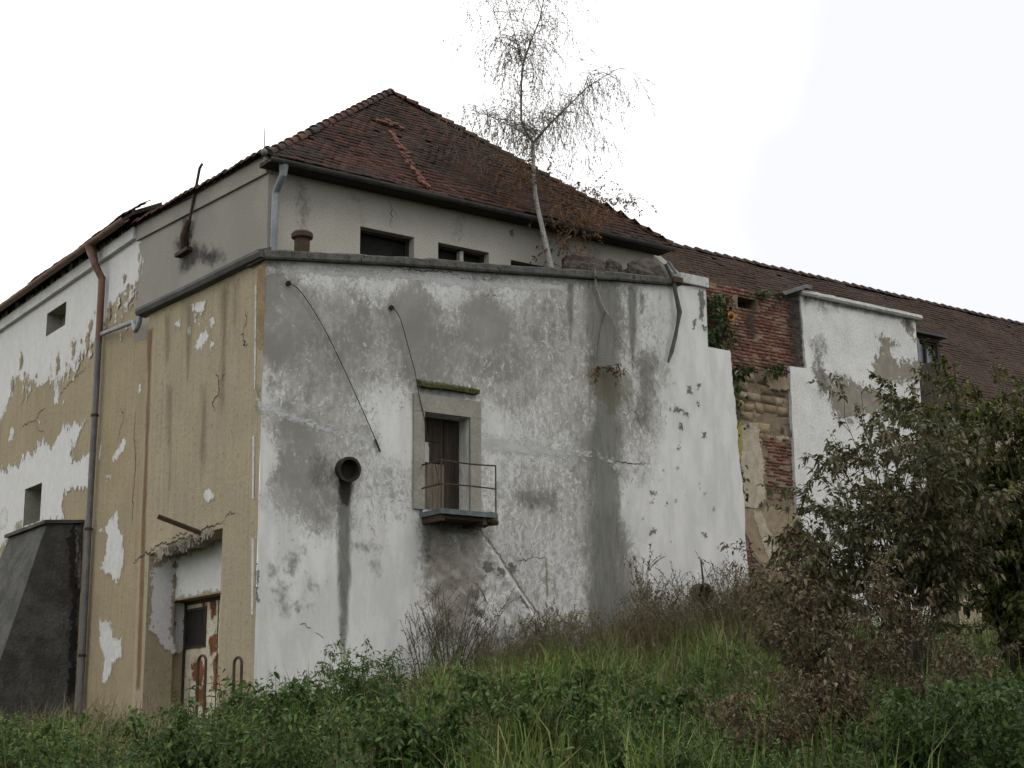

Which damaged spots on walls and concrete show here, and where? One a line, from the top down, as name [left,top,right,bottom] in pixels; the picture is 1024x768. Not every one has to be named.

peeling [0,419,127,550]
peeling [0,227,144,444]
peeling [175,300,217,353]
leakage [587,284,644,635]
spalling [669,383,701,431]
flaking render [812,318,925,424]
peeling [99,508,125,584]
flaking render [147,528,222,654]
leakage [338,479,352,649]
peeling [753,511,782,570]
peeling [98,618,123,684]
rust [191,601,219,707]